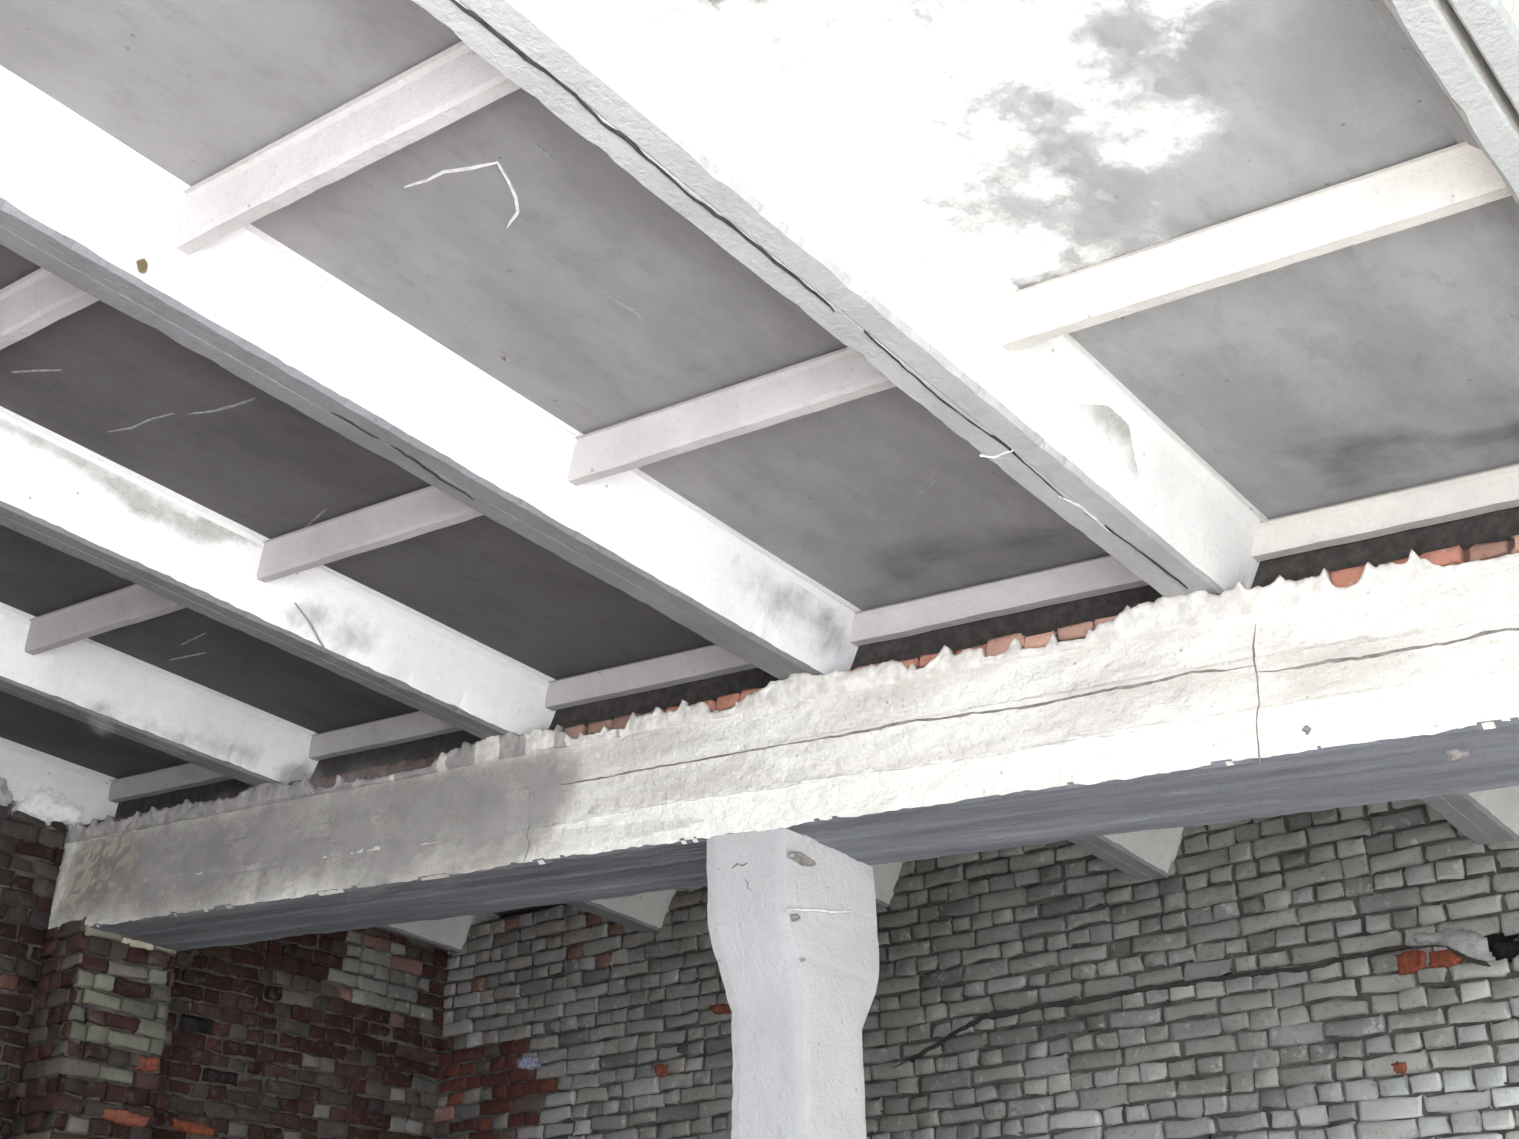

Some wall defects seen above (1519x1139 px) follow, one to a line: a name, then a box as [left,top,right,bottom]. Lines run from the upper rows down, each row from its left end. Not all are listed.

water stain [716,0,1215,284]
crack [450,0,1188,590]
crack [331,412,474,500]
crack [524,623,1519,862]